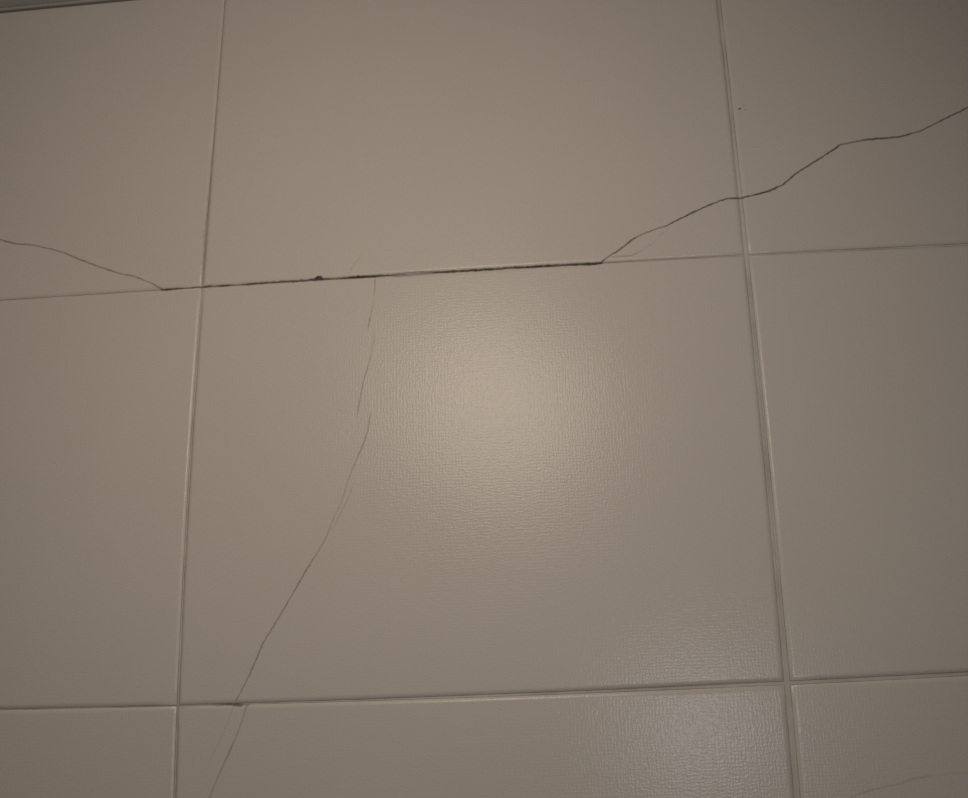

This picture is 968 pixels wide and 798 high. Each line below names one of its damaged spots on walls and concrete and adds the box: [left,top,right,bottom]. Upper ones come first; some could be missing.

crack [686,175,794,216]
crack [443,262,601,273]
crack [282,274,384,282]